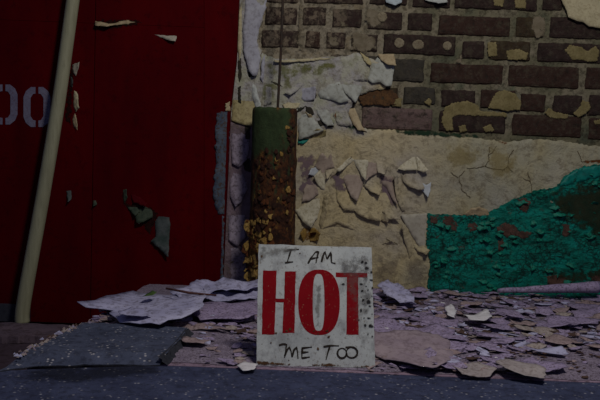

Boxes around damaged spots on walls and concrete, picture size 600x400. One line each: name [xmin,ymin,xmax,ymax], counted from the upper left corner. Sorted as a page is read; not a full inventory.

peeling [532,16,545,38]
peeling [561,0,600,28]
peeling [506,49,528,60]
peeling [565,45,599,62]
peeling [441,90,521,133]
peeling [545,100,591,119]
peeling [213,0,404,282]
crack [452,146,532,197]
peeling [122,189,171,257]
corrosion [241,209,275,282]
peeling [296,153,600,379]